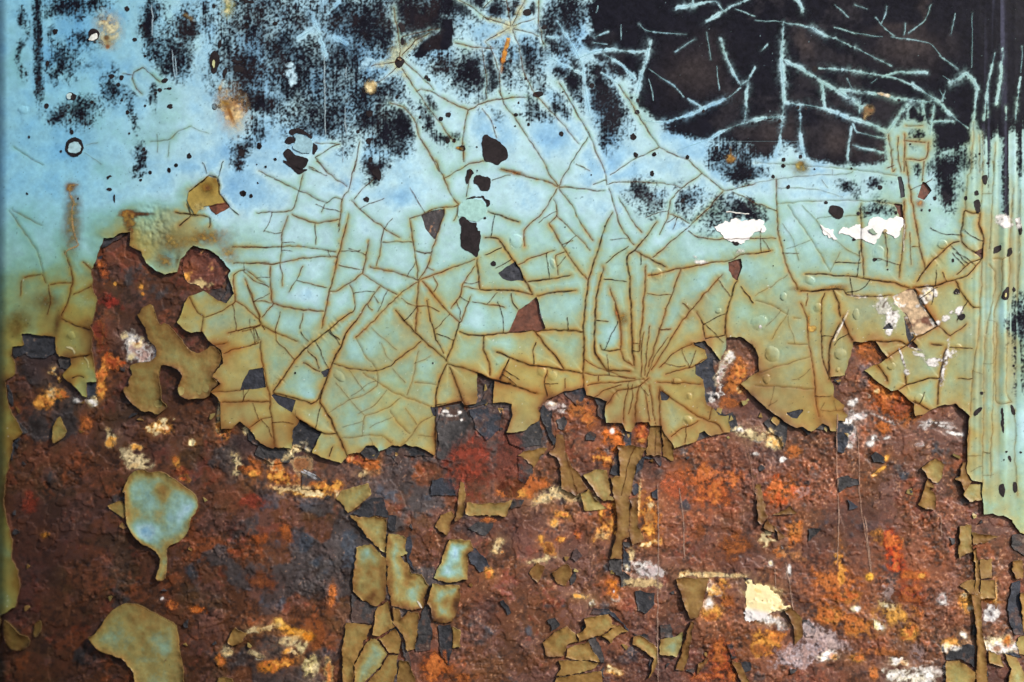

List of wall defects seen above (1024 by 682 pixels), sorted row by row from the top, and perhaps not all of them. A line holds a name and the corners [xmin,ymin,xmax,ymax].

damp [14,0,1024,232]
corrosion [159,231,233,290]
peeling [414,209,445,239]
peeling [445,127,508,257]
crack [176,0,984,496]
peeling [824,201,868,219]
crack [21,252,91,378]
damp [1004,292,1024,388]
corrosion [146,418,171,435]
corrosion [239,456,343,498]
peeling [0,232,1024,682]
corrosion [248,618,332,682]